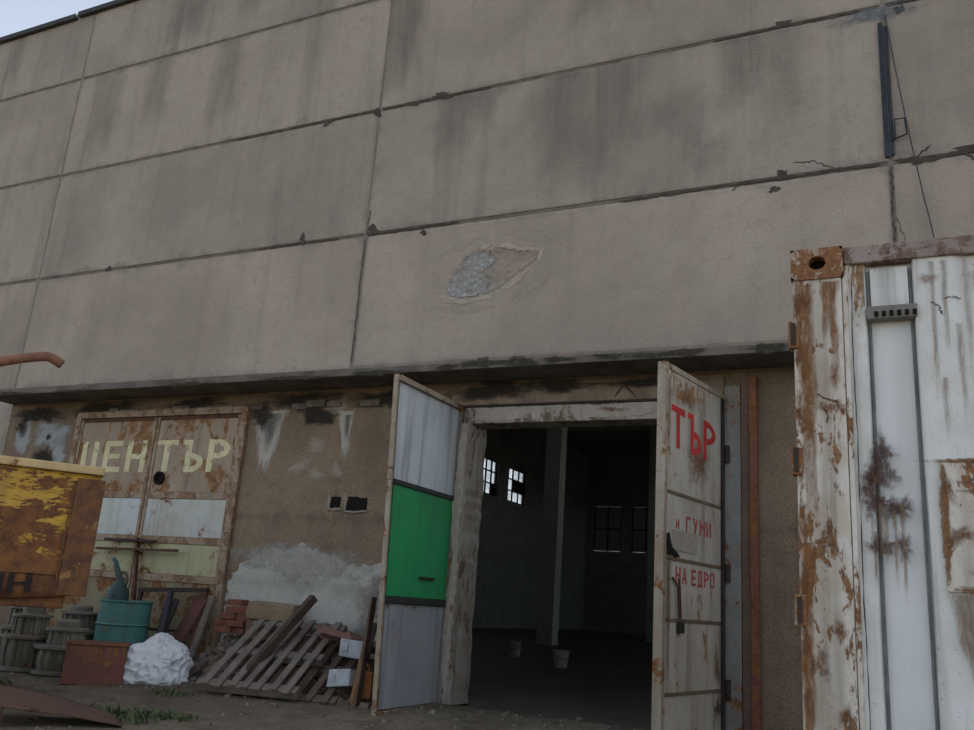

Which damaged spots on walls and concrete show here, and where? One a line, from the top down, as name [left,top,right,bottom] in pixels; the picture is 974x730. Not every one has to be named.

crack [620,144,974,242]
spalling [434,231,546,311]
damp [255,410,289,469]
damp [330,405,354,455]
corrosion [793,281,843,479]
corrosion [861,434,912,585]
peeling [220,543,381,643]
corrosion [799,543,828,730]
corrosion [926,458,974,664]